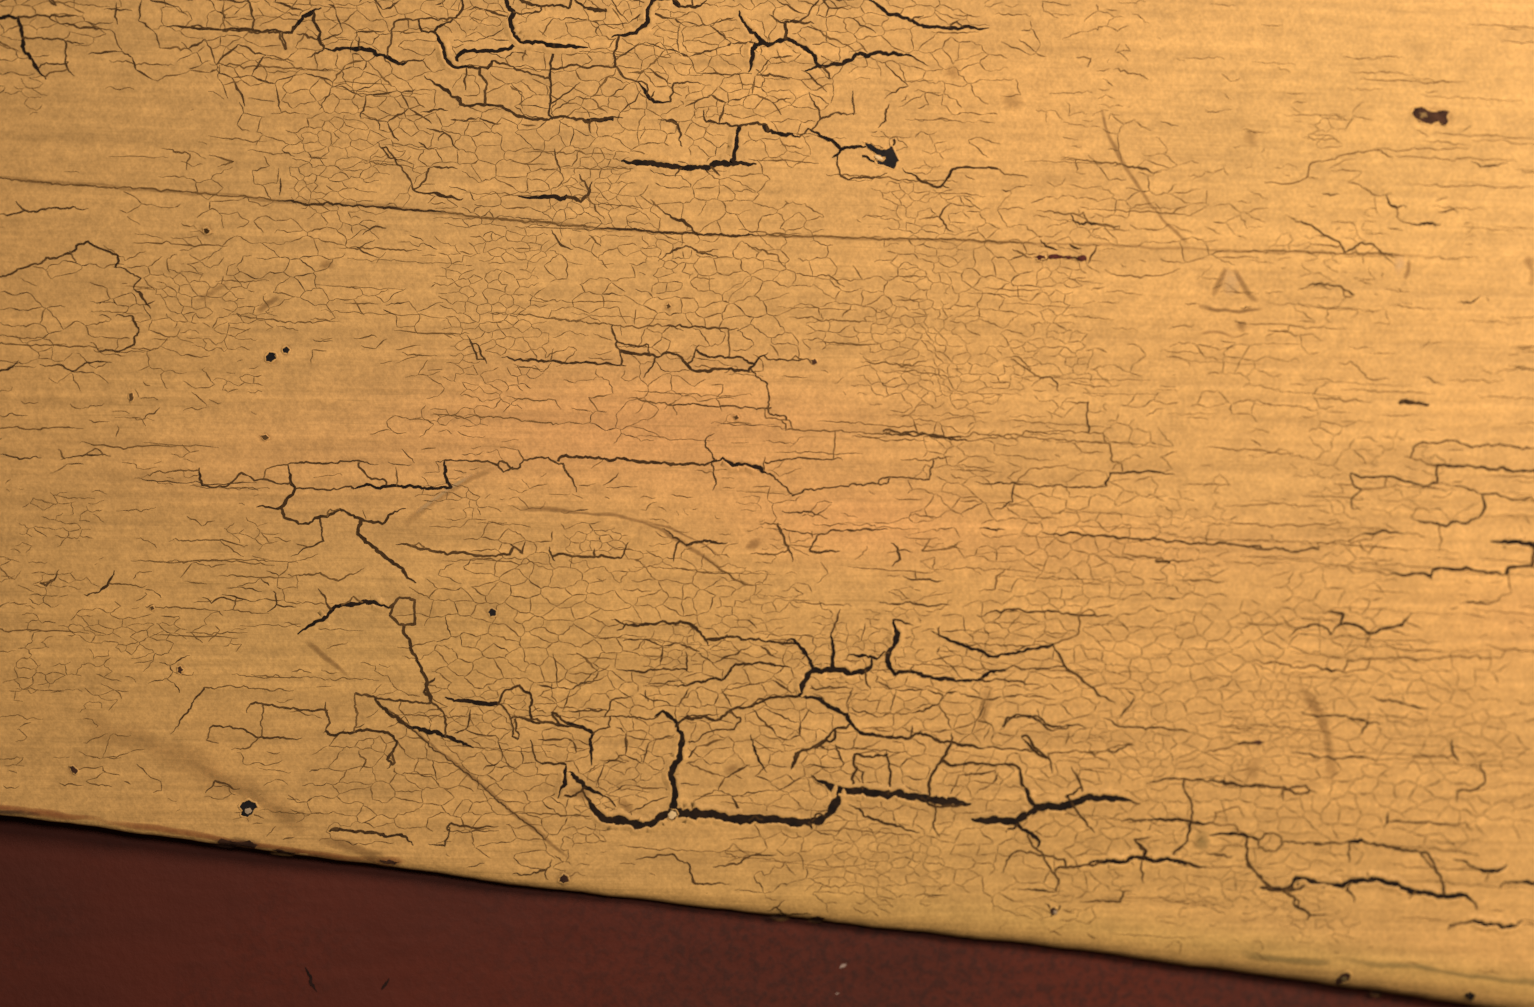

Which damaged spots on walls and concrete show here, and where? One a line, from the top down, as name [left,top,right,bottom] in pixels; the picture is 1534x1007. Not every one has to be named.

crack [0,0,132,79]
crack [162,0,1180,287]
crack [0,201,151,372]
crack [4,448,108,460]
crack [40,570,147,596]